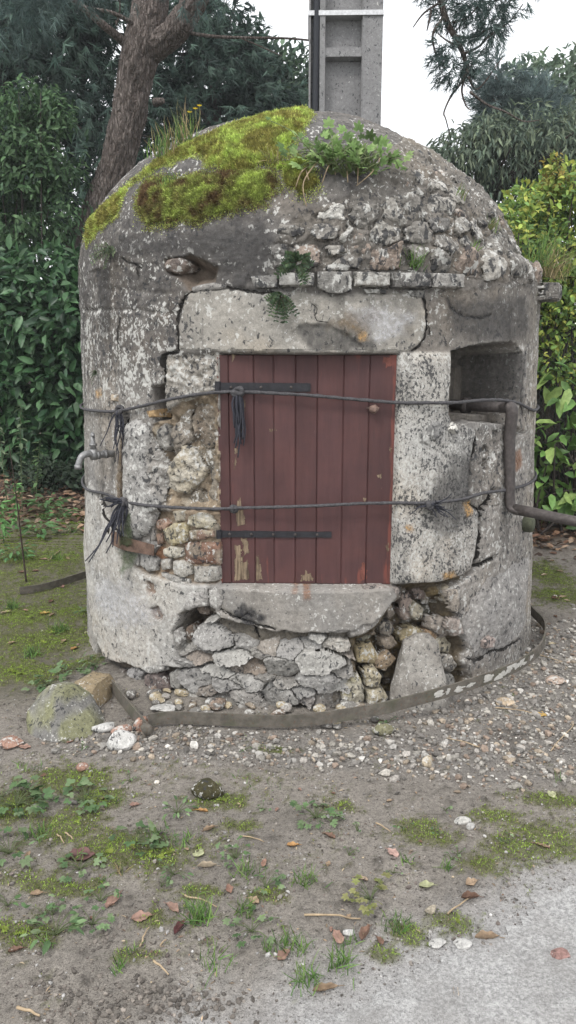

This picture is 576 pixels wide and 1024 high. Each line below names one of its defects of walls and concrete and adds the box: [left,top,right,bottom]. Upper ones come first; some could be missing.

crack [159,291,194,383]
crack [226,285,275,295]
crack [411,298,491,351]
spalling [105,391,534,711]
crack [467,494,493,567]